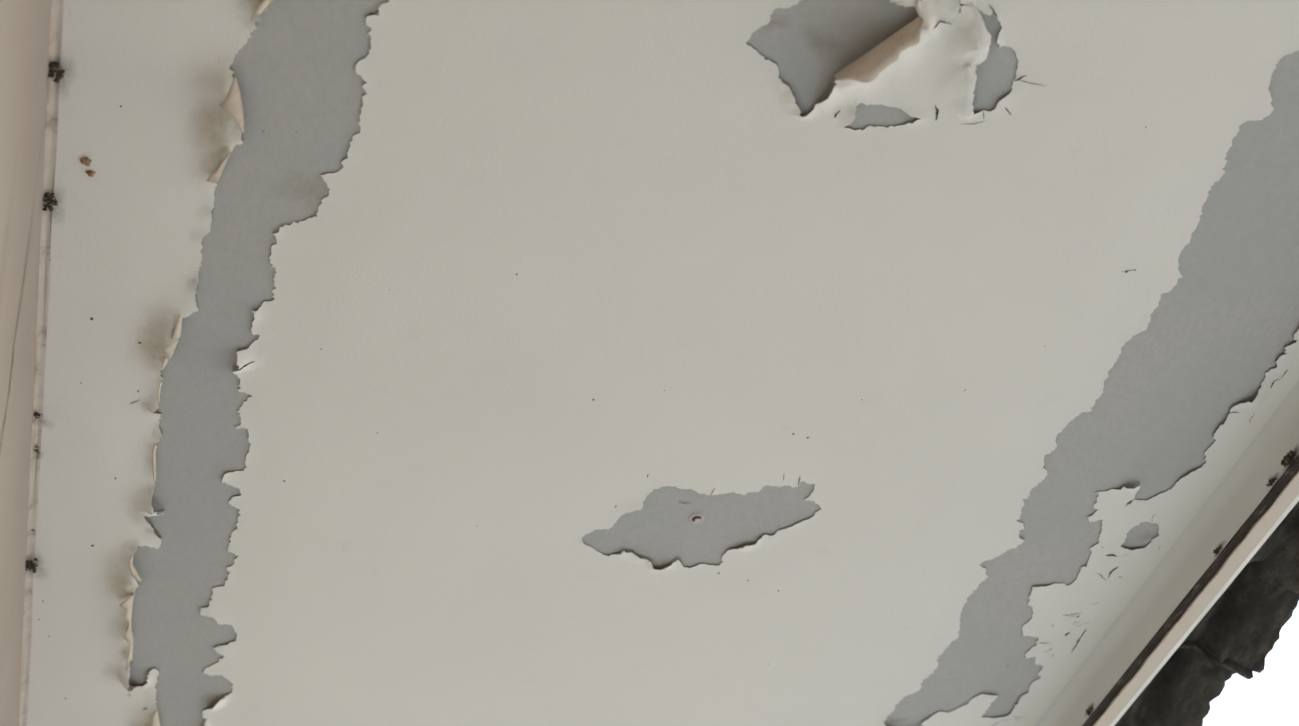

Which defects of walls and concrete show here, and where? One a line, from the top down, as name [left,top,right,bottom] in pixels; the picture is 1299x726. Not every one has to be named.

peeling [102,0,389,726]
peeling [582,481,821,572]
peeling [746,0,1018,129]
peeling [879,50,1299,726]